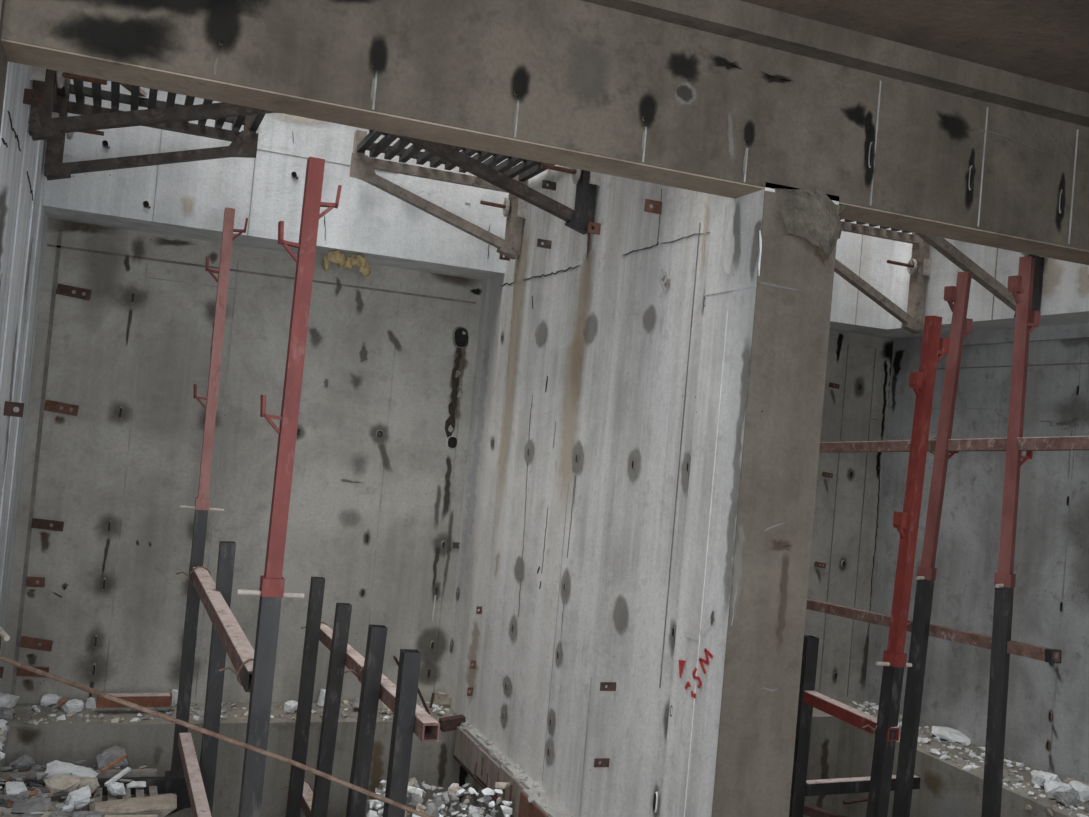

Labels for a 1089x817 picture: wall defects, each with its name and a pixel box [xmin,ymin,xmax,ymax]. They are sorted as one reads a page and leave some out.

damp [844,105,875,185]
crack [623,189,709,255]
crack [503,265,579,309]